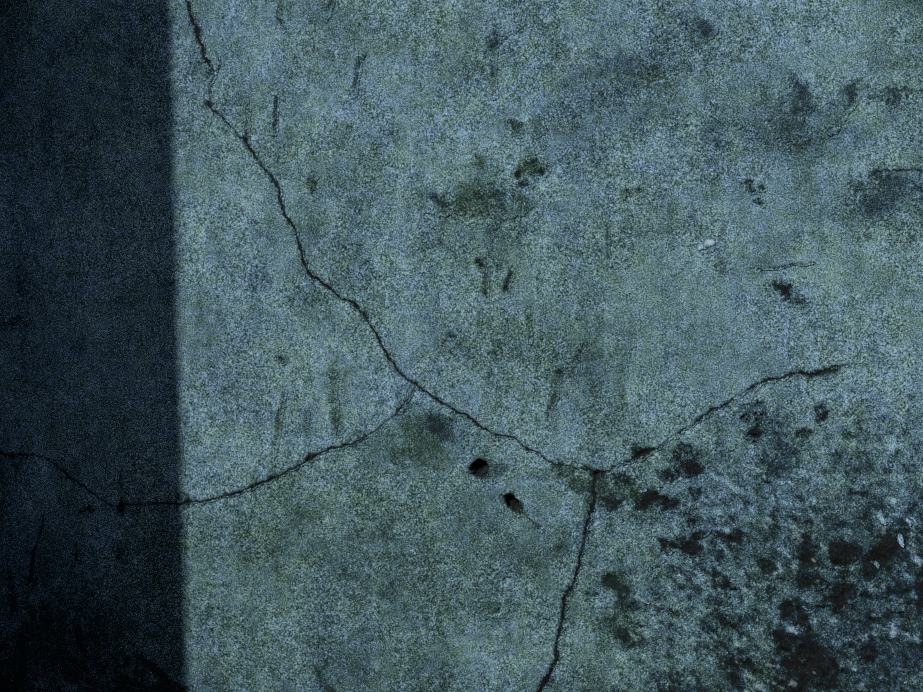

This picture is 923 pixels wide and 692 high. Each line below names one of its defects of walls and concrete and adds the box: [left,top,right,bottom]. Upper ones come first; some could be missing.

crack [0,385,418,516]
crack [185,0,852,692]
water stain [647,669,686,692]
water stain [627,434,753,633]
water stain [791,398,835,443]
water stain [721,520,923,692]